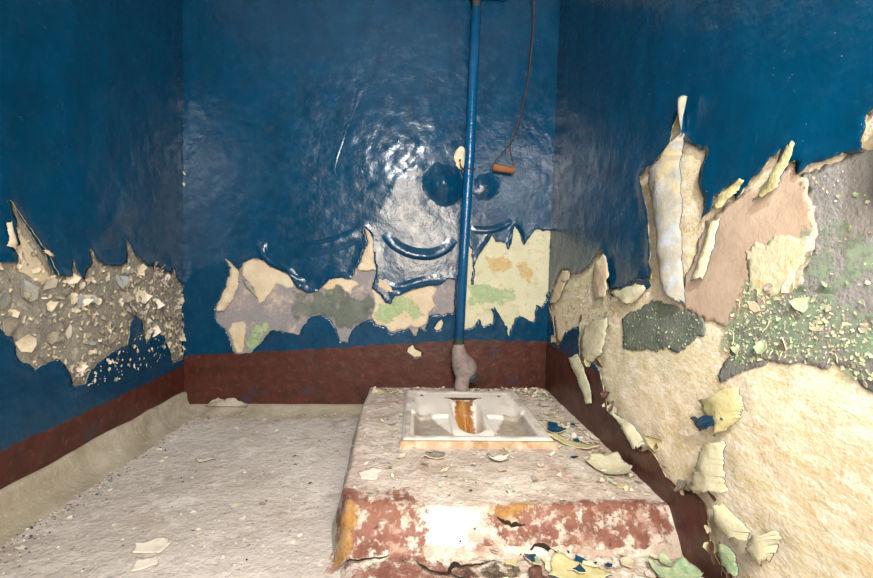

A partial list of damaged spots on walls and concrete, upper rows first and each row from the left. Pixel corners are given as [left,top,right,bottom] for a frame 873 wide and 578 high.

flaking render [454,146,465,170]
peeling [0,198,186,387]
peeling [215,228,455,357]
peeling [465,95,873,578]
peeling [424,450,447,459]
peeling [325,467,704,578]